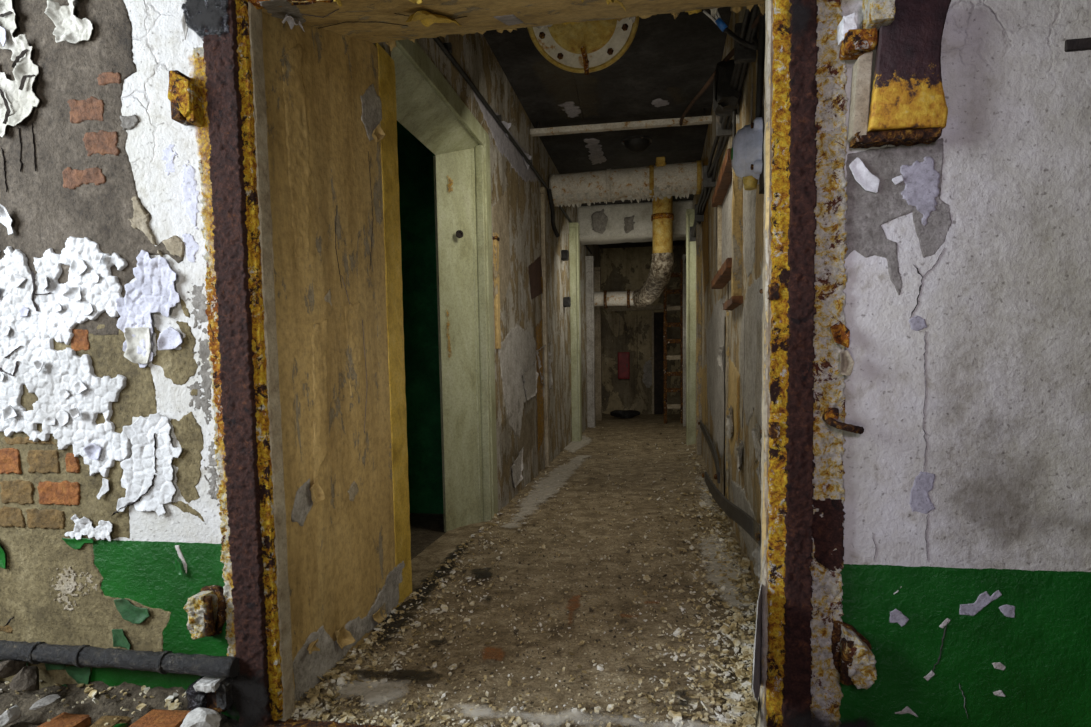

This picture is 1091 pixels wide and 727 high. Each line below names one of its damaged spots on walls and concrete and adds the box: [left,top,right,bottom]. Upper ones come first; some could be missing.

flaking render [0,0,200,298]
rust [189,56,228,492]
peeling [845,138,952,295]
flaking render [20,384,38,411]
flaking render [53,283,221,522]
rust [536,320,544,451]
rust [830,321,854,376]
flaking render [0,423,171,652]
rust [812,498,846,571]
flaking render [26,662,92,689]
spalling [889,609,909,627]
spalling [939,590,1015,628]